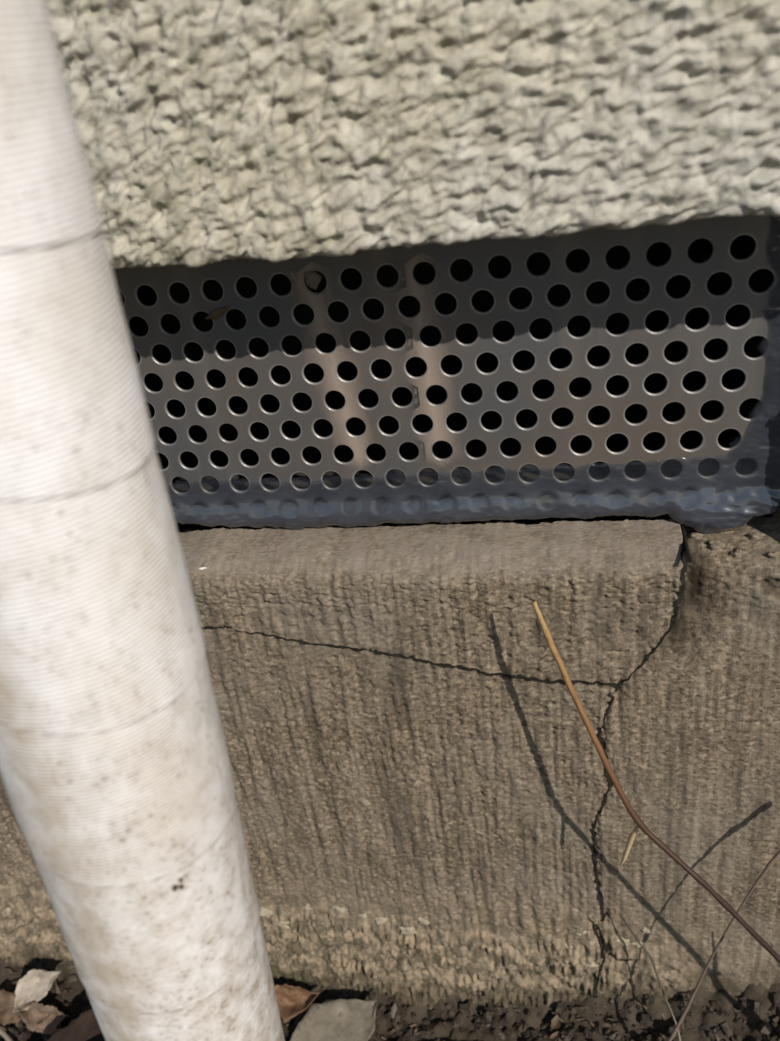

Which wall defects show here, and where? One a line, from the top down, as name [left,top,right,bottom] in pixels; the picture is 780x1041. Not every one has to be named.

crack [202,525,692,998]